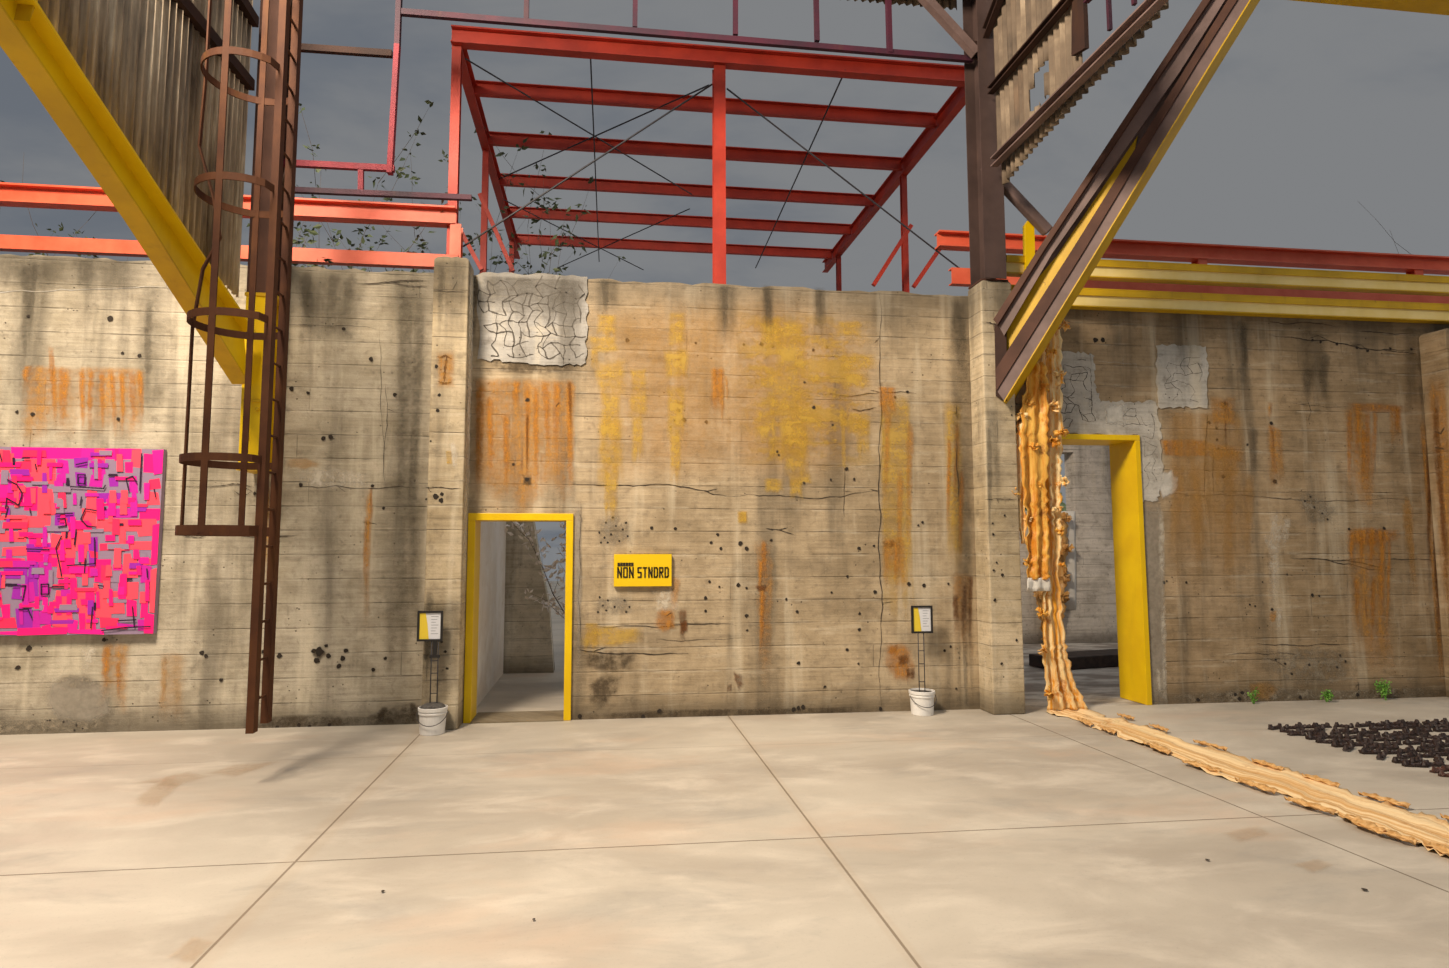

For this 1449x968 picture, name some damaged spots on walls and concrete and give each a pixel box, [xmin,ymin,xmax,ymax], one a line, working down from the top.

rust [23,365,142,417]
rust [477,382,574,501]
crack [573,303,916,706]
rust [881,387,912,580]
crack [1165,357,1431,502]